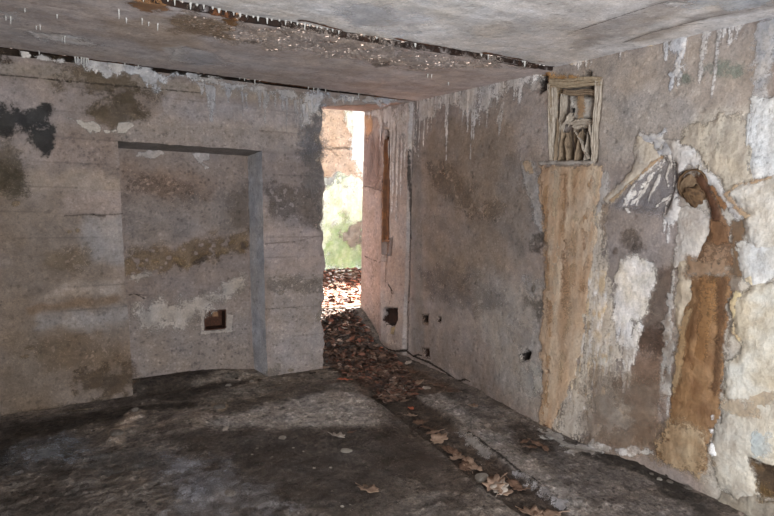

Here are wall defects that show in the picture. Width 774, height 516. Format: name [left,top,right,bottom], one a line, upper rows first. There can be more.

water stain [0,102,56,200]
water stain [20,47,544,271]
rust [381,136,390,279]
water stain [520,157,595,234]
spalling [616,154,678,216]
water stain [534,17,774,516]